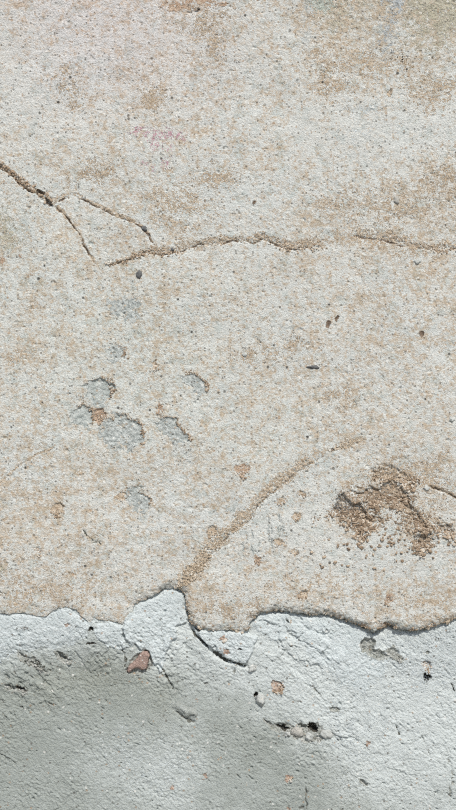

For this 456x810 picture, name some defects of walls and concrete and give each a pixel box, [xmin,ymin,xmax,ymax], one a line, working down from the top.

crack [0,160,333,267]
crack [350,226,456,255]
spalling [180,369,211,396]
spalling [68,375,146,454]
spalling [155,403,193,447]
spalling [311,444,456,563]
peeling [0,586,456,694]
spalling [4,670,27,708]
spalling [263,719,323,744]